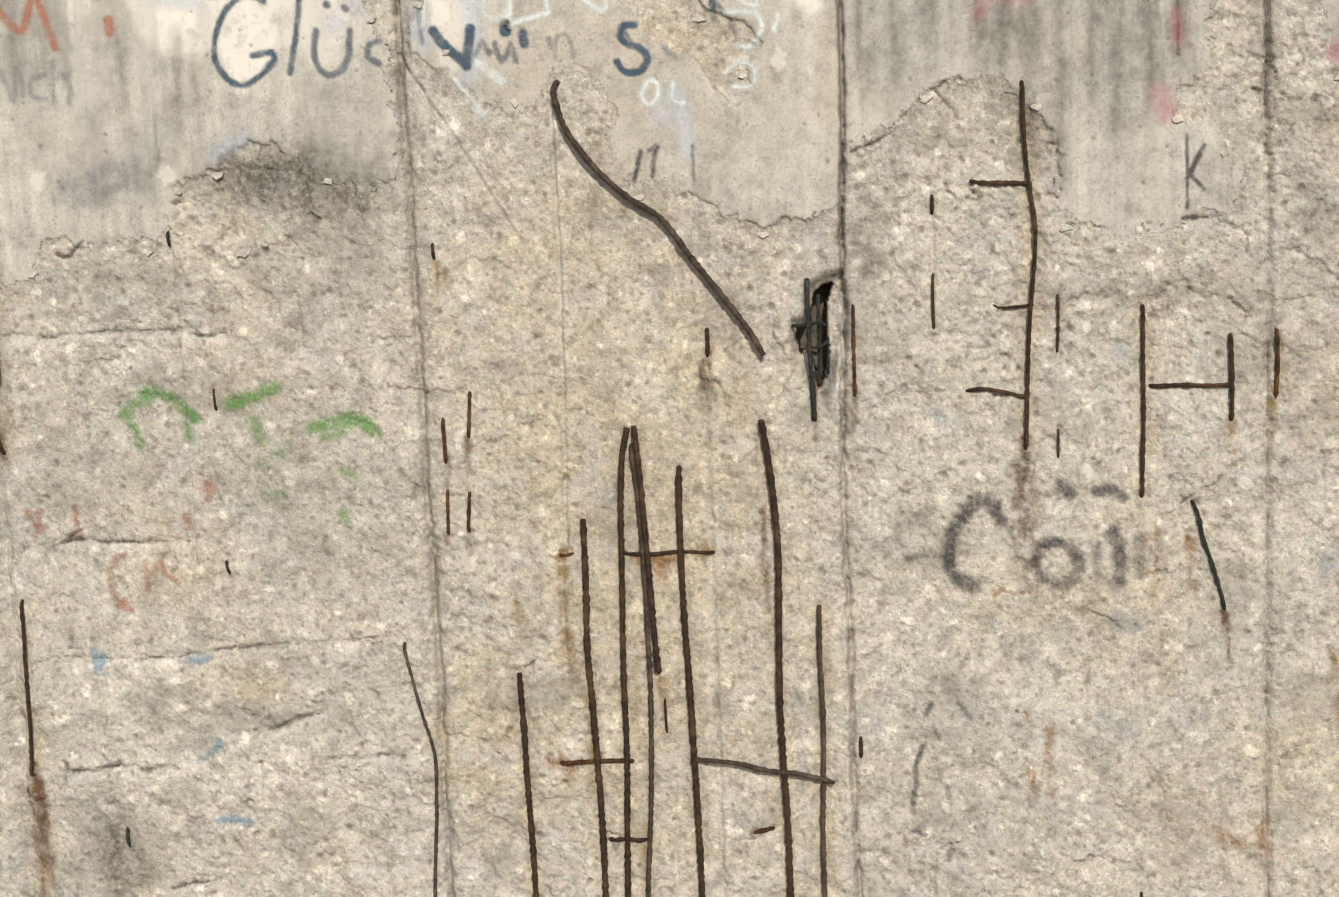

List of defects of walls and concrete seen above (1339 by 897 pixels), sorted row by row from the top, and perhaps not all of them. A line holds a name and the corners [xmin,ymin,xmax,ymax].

rust [27,762,52,872]
spalling [0,0,859,897]
spalling [837,0,1339,897]